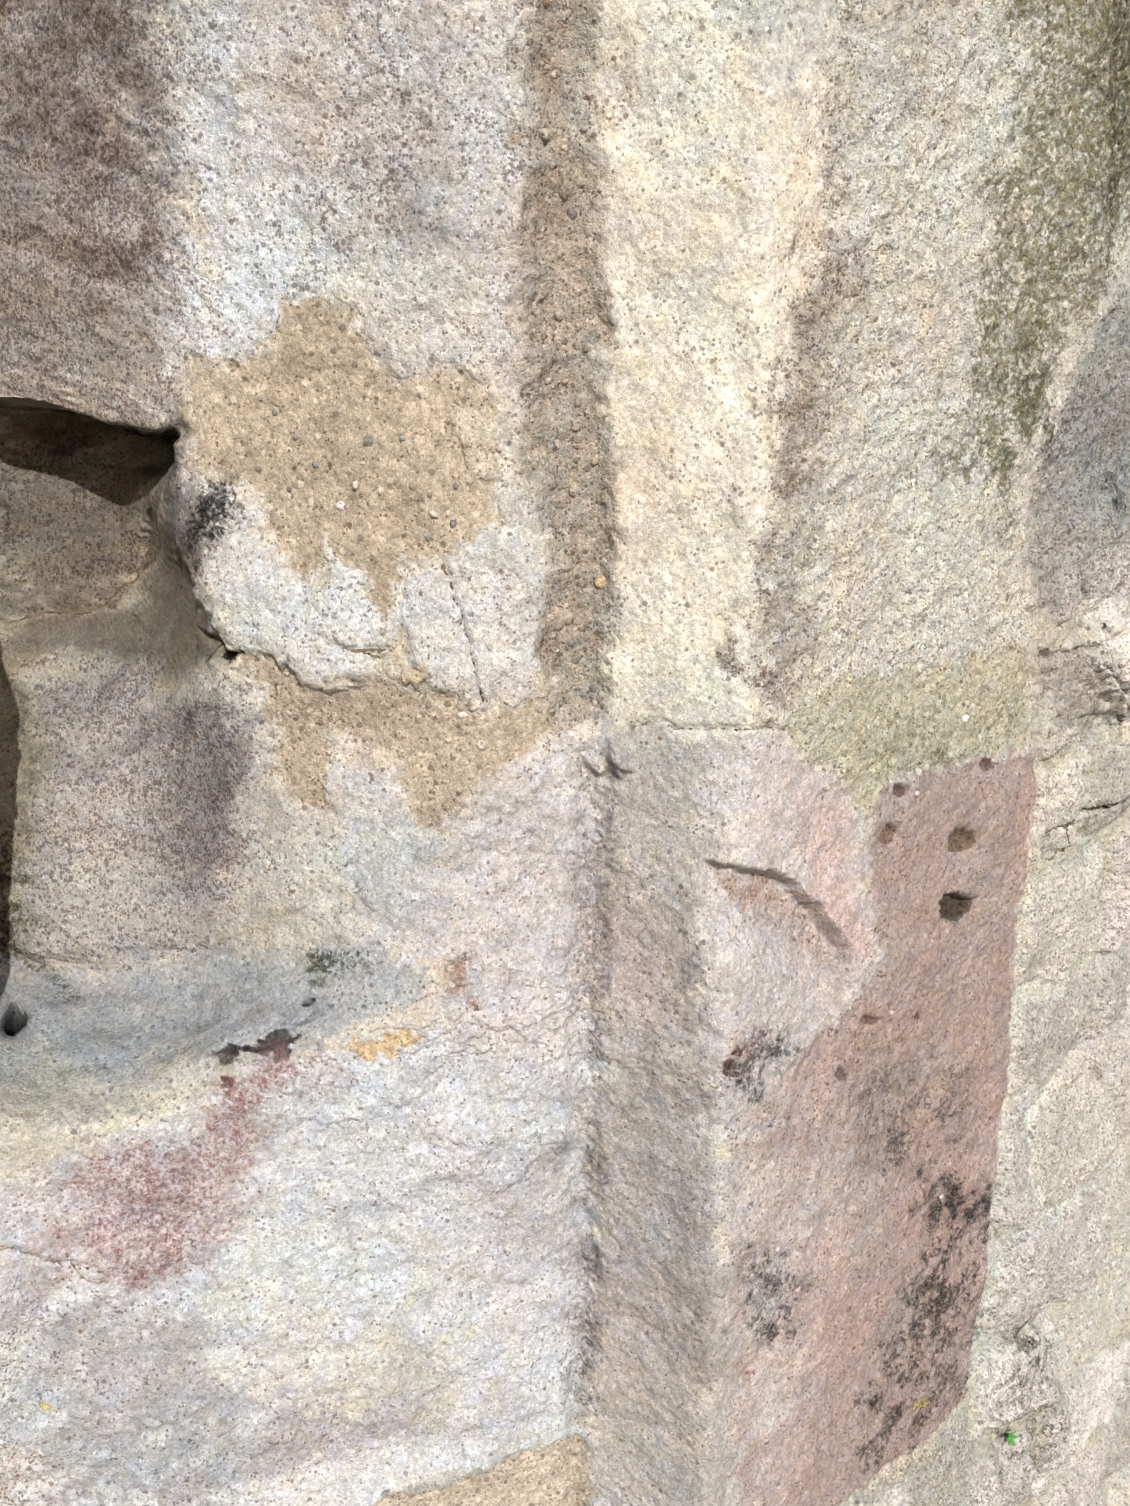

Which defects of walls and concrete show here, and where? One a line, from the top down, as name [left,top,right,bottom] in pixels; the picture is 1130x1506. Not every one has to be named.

leakage [1087,0,1130,212]
spalling [178,0,621,830]
leakage [997,320,1048,467]
crack [441,563,484,702]
crack [0,1245,113,1285]